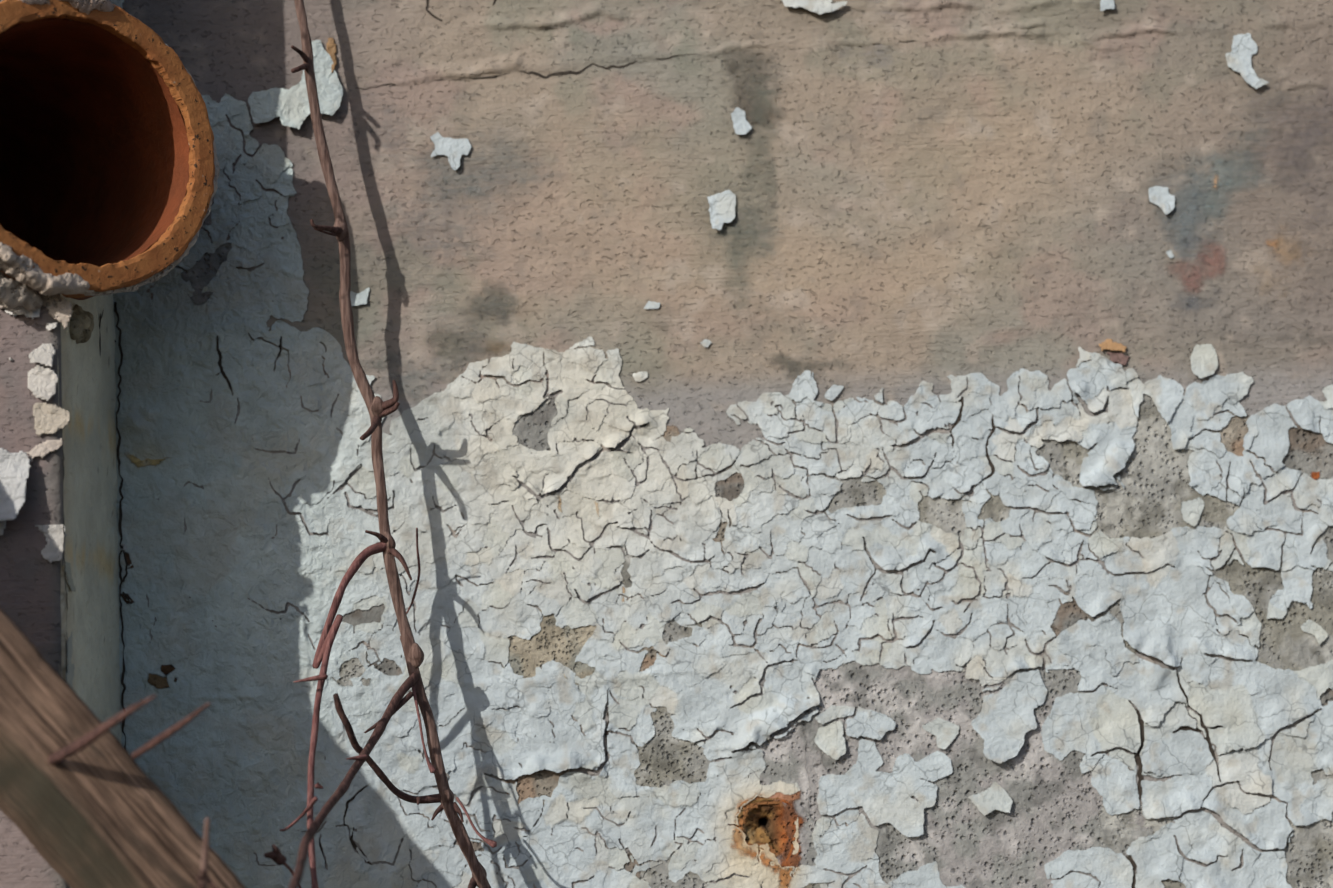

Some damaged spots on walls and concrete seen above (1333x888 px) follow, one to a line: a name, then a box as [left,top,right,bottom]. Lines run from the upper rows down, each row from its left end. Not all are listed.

peeling [782,0,847,15]
crack [435,53,698,81]
peeling [1225,33,1269,89]
peeling [707,190,736,230]
peeling [1149,186,1175,215]
peeling [0,290,94,535]
crack [949,397,995,484]
crack [99,302,132,748]
peeling [381,337,1333,888]
crack [1128,668,1221,801]
rust [733,791,803,888]
crack [1126,855,1136,888]